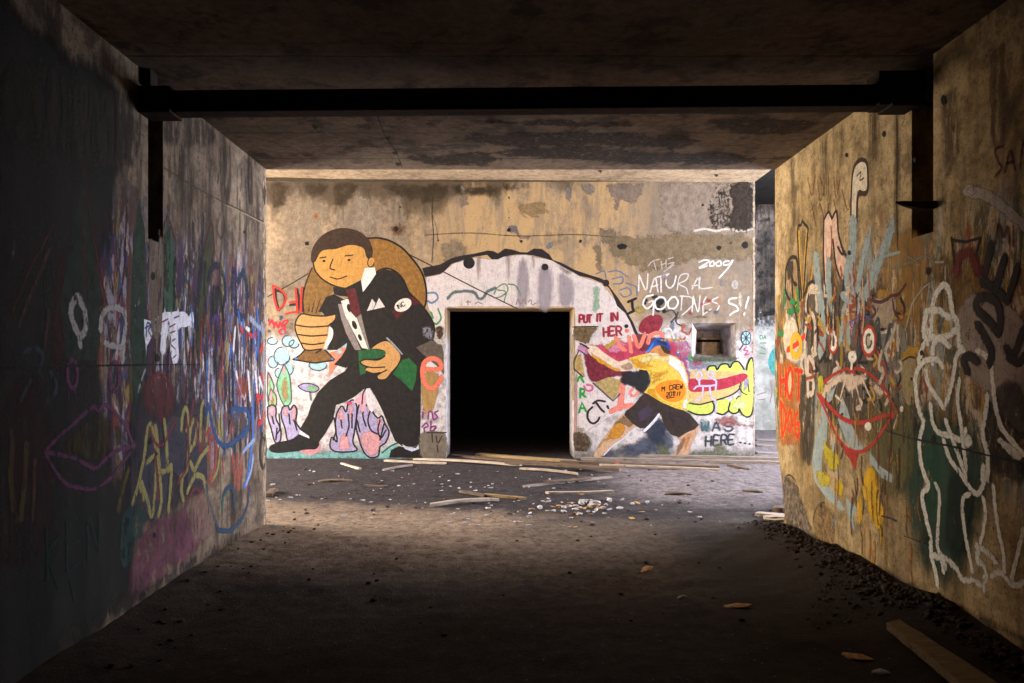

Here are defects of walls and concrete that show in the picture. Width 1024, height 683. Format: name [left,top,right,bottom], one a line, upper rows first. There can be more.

water stain [408,118,753,167]
water stain [266,177,611,209]
peeling [593,174,757,448]